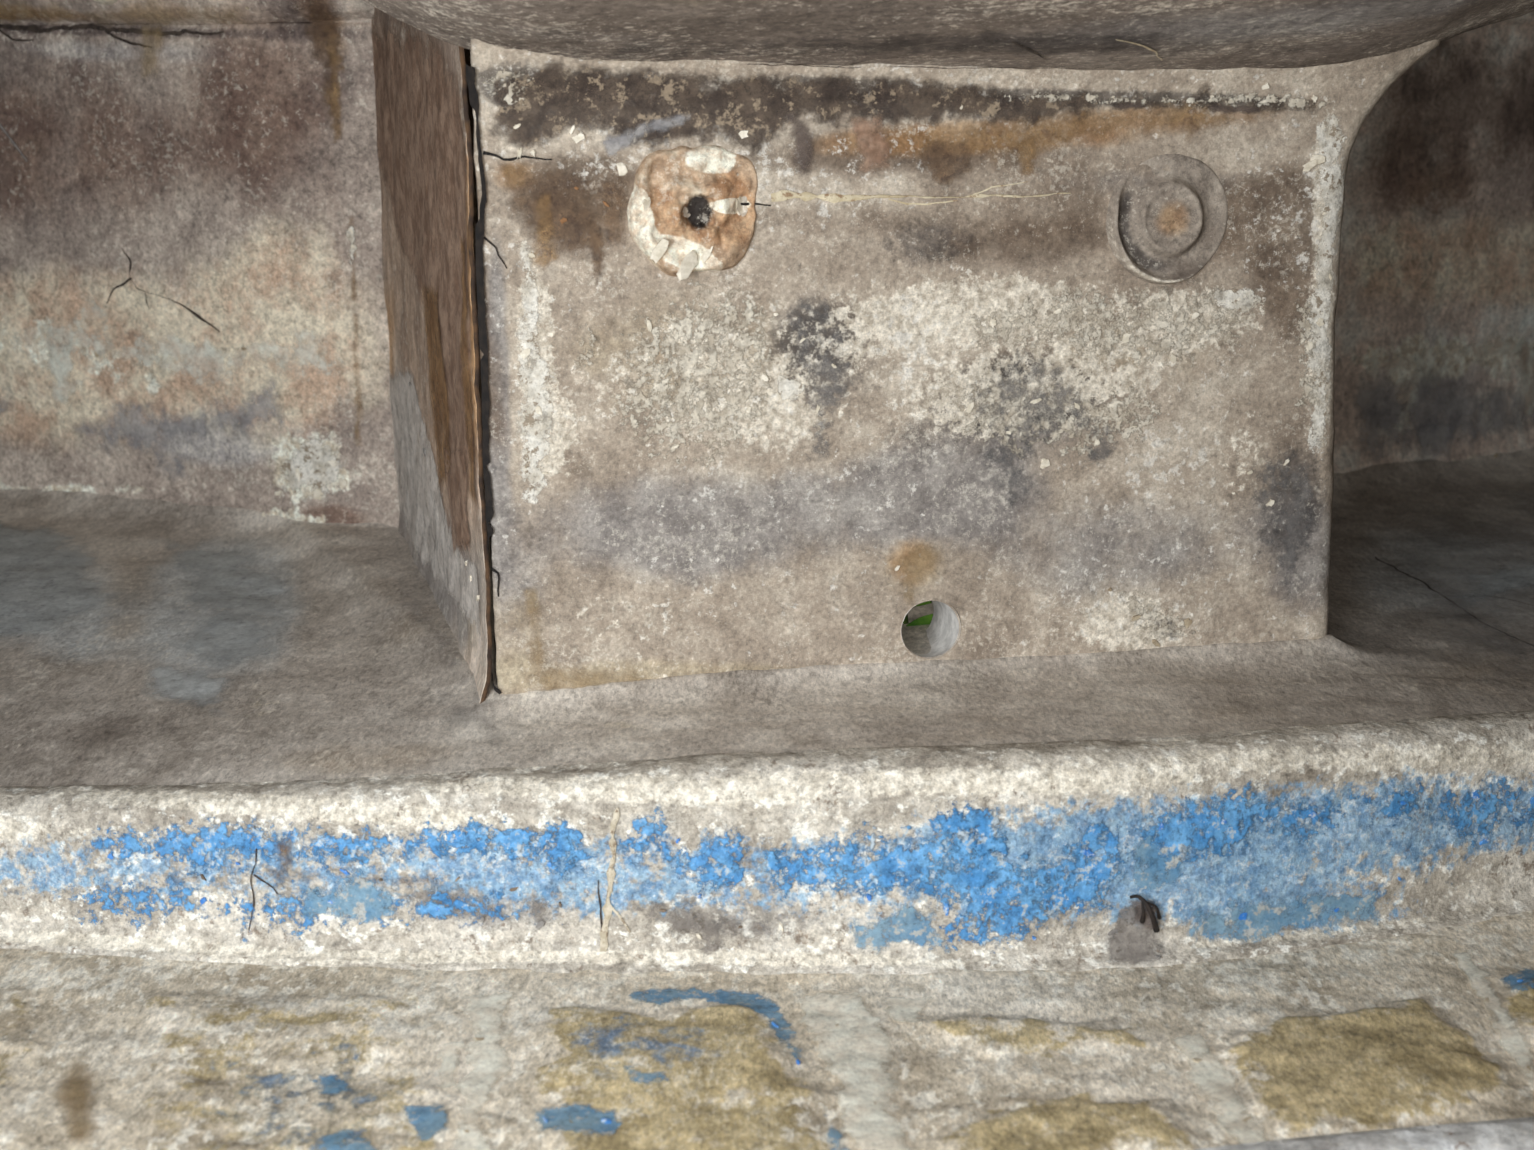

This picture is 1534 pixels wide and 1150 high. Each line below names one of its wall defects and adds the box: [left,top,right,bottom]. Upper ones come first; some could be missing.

crack [0,23,224,48]
leakage [493,63,1230,171]
rust [922,114,1086,183]
rust [504,167,625,275]
leakage [11,304,330,405]
leakage [790,304,850,453]
leakage [275,437,347,502]
peeling [69,816,598,942]
peeling [618,775,1534,965]
peeling [630,987,802,1065]
peeling [403,1105,470,1140]
peeling [535,1104,621,1135]